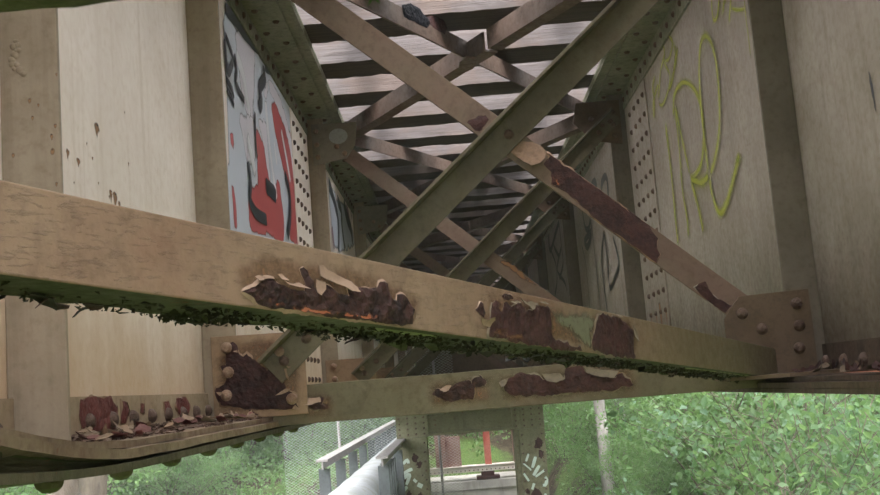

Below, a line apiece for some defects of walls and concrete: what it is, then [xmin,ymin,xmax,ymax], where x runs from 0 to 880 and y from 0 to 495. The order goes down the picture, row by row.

rust [19,288,749,384]
peeling [475,293,639,359]
peeling [432,365,634,403]
peeling [79,394,145,431]
peeling [163,396,191,421]